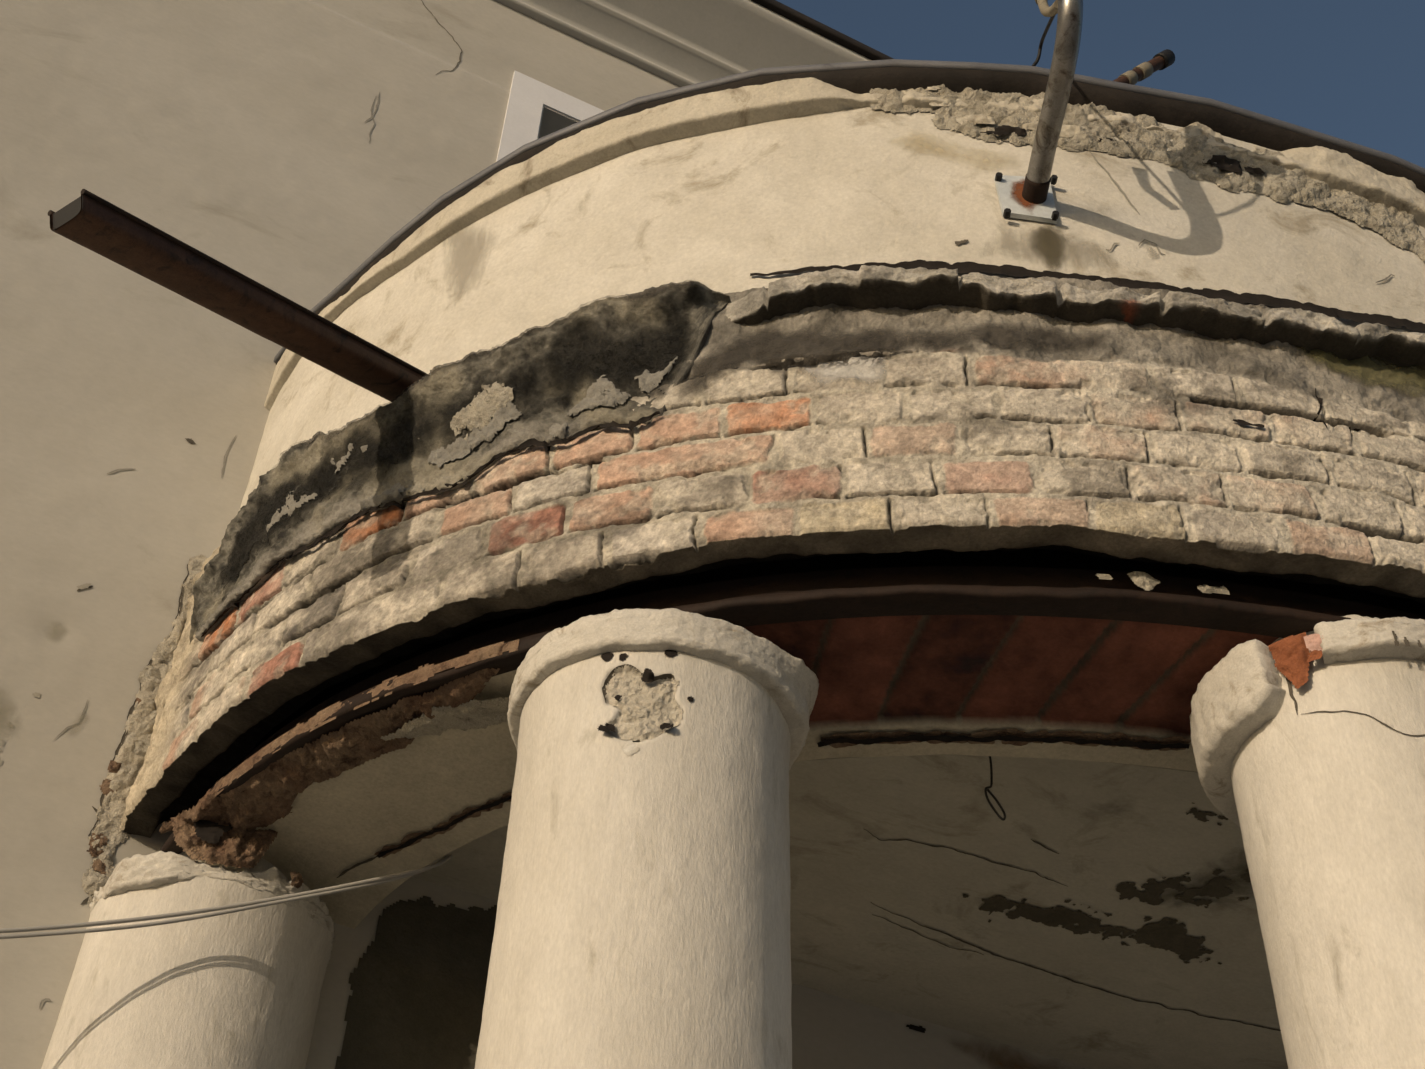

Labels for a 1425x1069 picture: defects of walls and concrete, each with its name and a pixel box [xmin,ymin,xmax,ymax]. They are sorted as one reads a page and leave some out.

crack [421,0,462,75]
spalling [869,84,1045,147]
corrosion [1011,180,1035,208]
spalling [1057,102,1425,263]
leakage [220,281,694,583]
spalling [81,554,207,906]
spalling [159,668,509,869]
spalling [597,652,694,742]
crack [1286,678,1425,736]
crack [336,792,512,878]
peeling [963,868,1251,965]
peeling [335,896,497,1069]